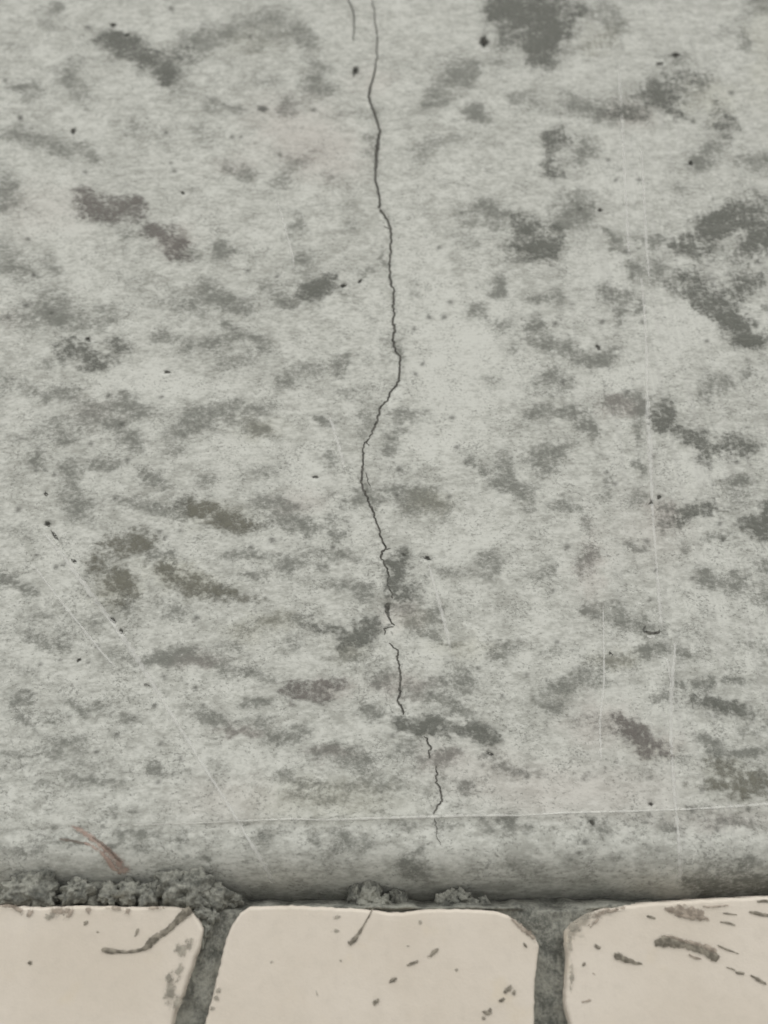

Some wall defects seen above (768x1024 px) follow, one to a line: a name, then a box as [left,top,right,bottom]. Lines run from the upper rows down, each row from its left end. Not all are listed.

crack [348,0,404,714]
crack [424,736,443,845]